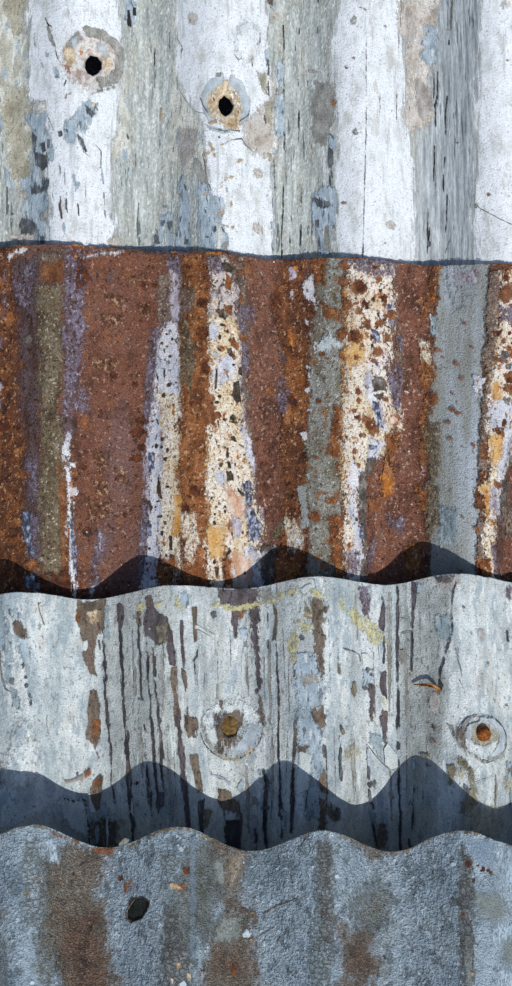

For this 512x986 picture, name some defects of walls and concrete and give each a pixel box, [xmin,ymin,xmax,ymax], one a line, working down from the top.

peeling [0,86,115,245]
peeling [123,0,137,36]
peeling [265,49,285,155]
peeling [308,69,347,257]
corrosion [0,245,83,599]
corrosion [73,244,271,587]
peeling [61,126,461,850]
corrosion [270,257,444,584]
corrosion [418,263,512,579]
corrosion [287,598,329,682]
corrosion [167,867,191,892]
peeling [495,762,512,810]